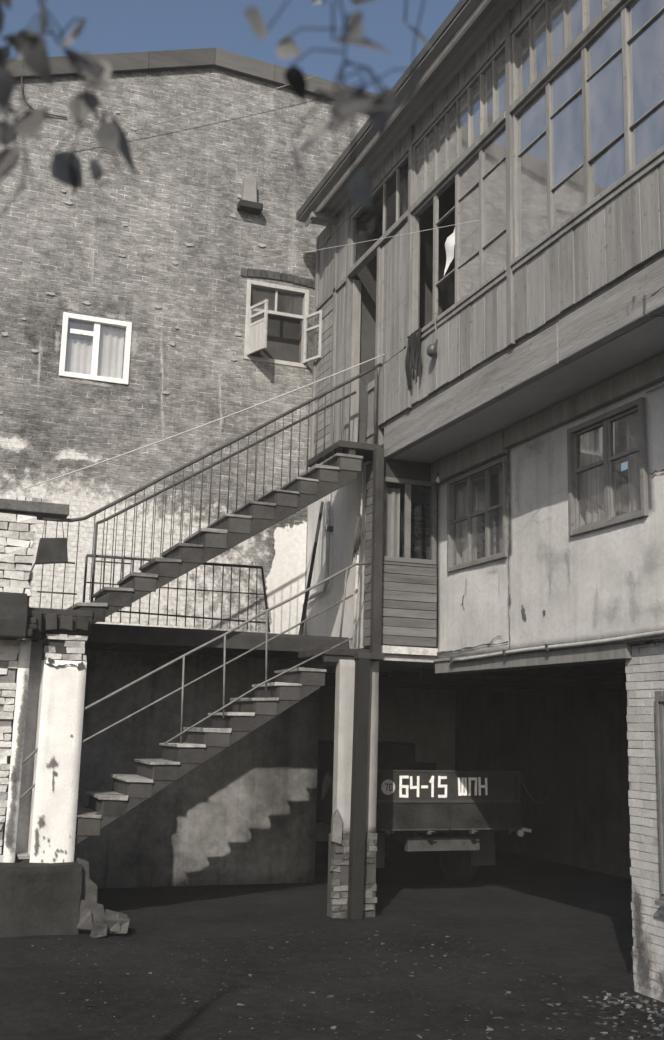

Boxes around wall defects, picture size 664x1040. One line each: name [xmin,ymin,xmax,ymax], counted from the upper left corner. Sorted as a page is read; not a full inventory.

peeling [0,436,28,453]
peeling [0,448,232,609]
peeling [96,520,307,635]
spalling [45,658,86,670]
leakage [631,891,664,1002]